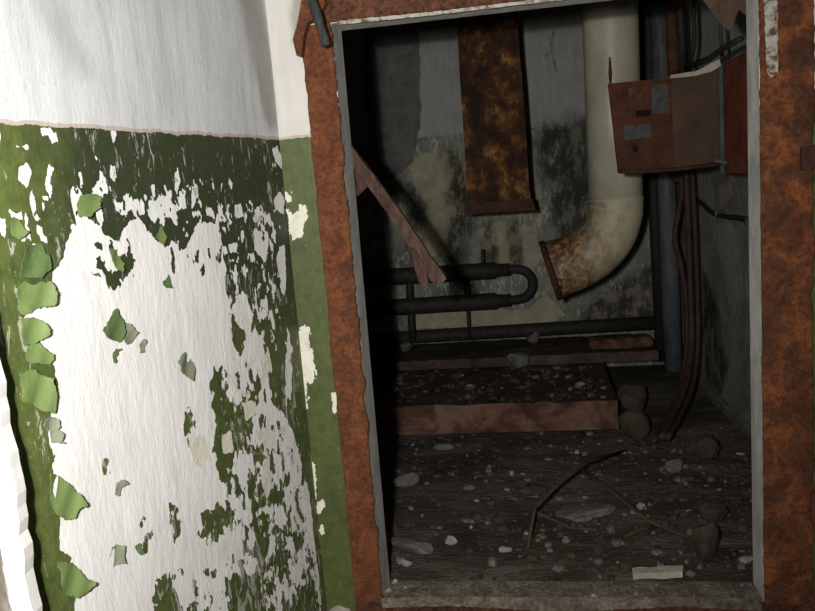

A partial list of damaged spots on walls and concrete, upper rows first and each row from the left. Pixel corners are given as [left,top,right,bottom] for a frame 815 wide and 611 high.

peeling [40,127,58,144]
peeling [272,146,282,174]
damp [446,152,472,260]
damp [540,120,588,236]
damp [587,268,653,320]
peeling [0,162,350,611]